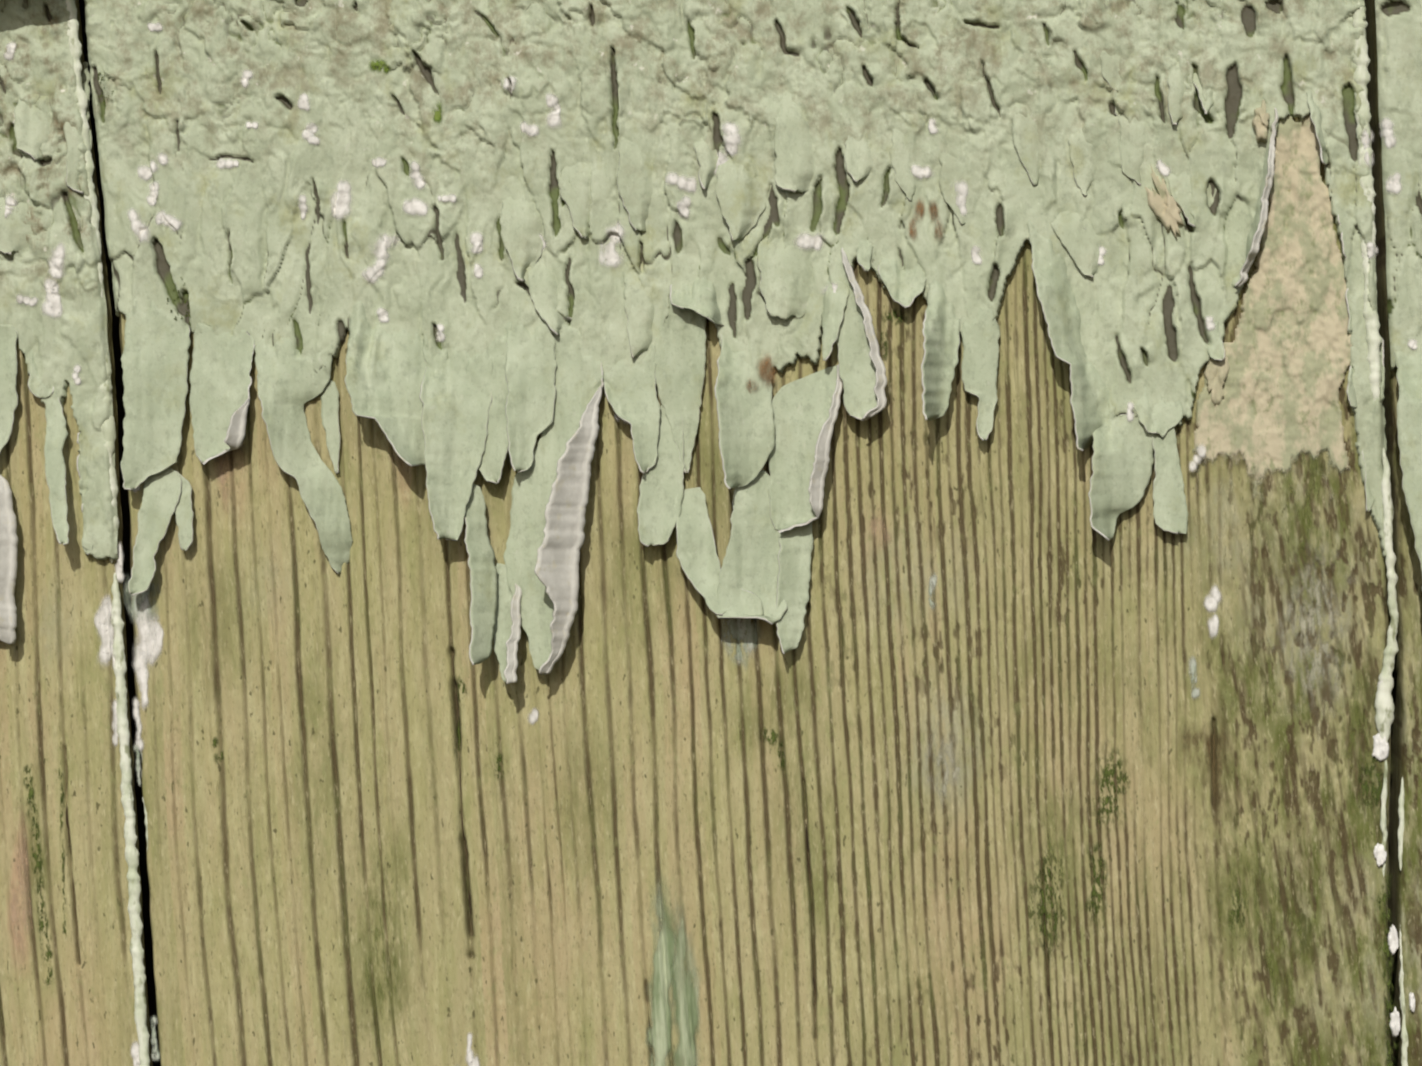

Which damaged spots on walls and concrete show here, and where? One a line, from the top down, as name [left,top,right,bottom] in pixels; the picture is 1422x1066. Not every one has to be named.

peeling [0,0,1422,785]
crack [66,806,76,913]